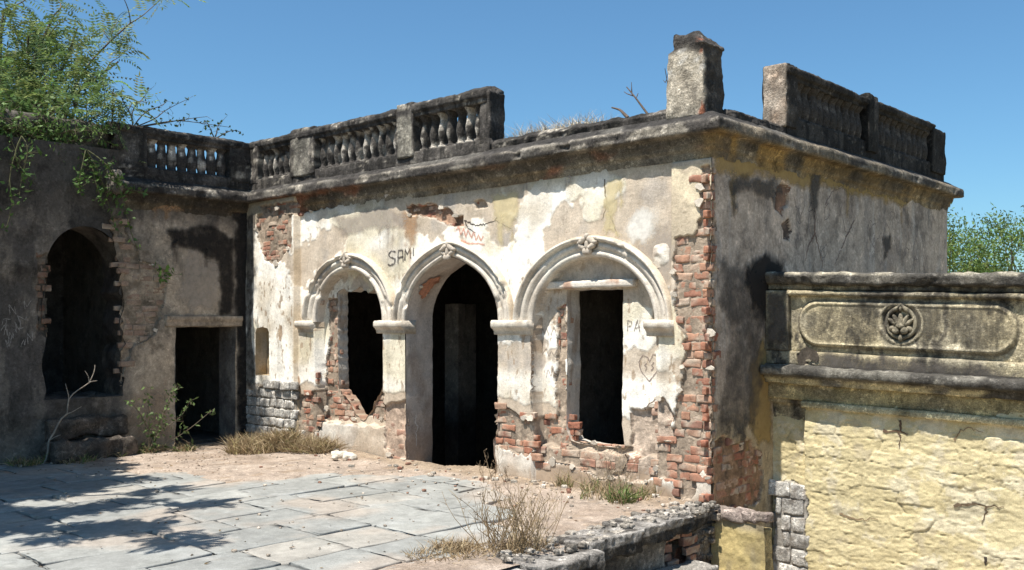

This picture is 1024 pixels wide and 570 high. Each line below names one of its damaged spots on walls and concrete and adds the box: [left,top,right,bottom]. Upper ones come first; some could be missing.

flaking render [254,200,317,266]
flaking render [407,203,464,226]
leakage [716,157,907,216]
leakage [883,235,891,258]
flaking render [34,252,52,337]
leakage [168,212,255,439]
flaking render [246,294,360,438]
flaking render [494,165,810,570]
crack [883,420,908,449]
crack [953,502,1003,521]